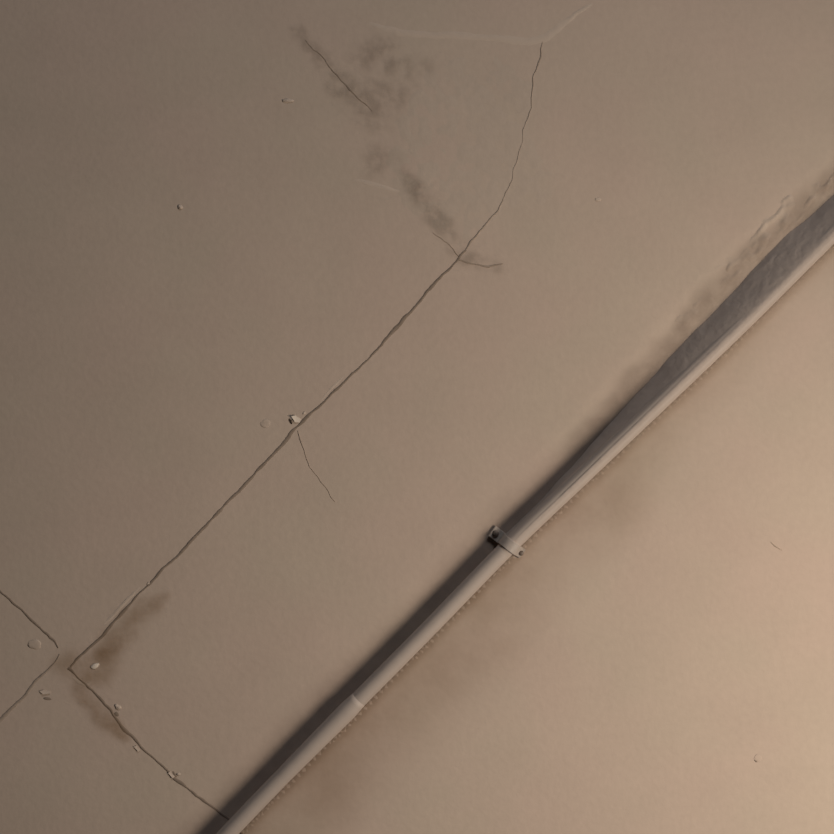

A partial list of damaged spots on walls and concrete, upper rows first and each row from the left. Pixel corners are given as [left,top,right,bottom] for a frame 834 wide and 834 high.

crack [0,41,543,834]